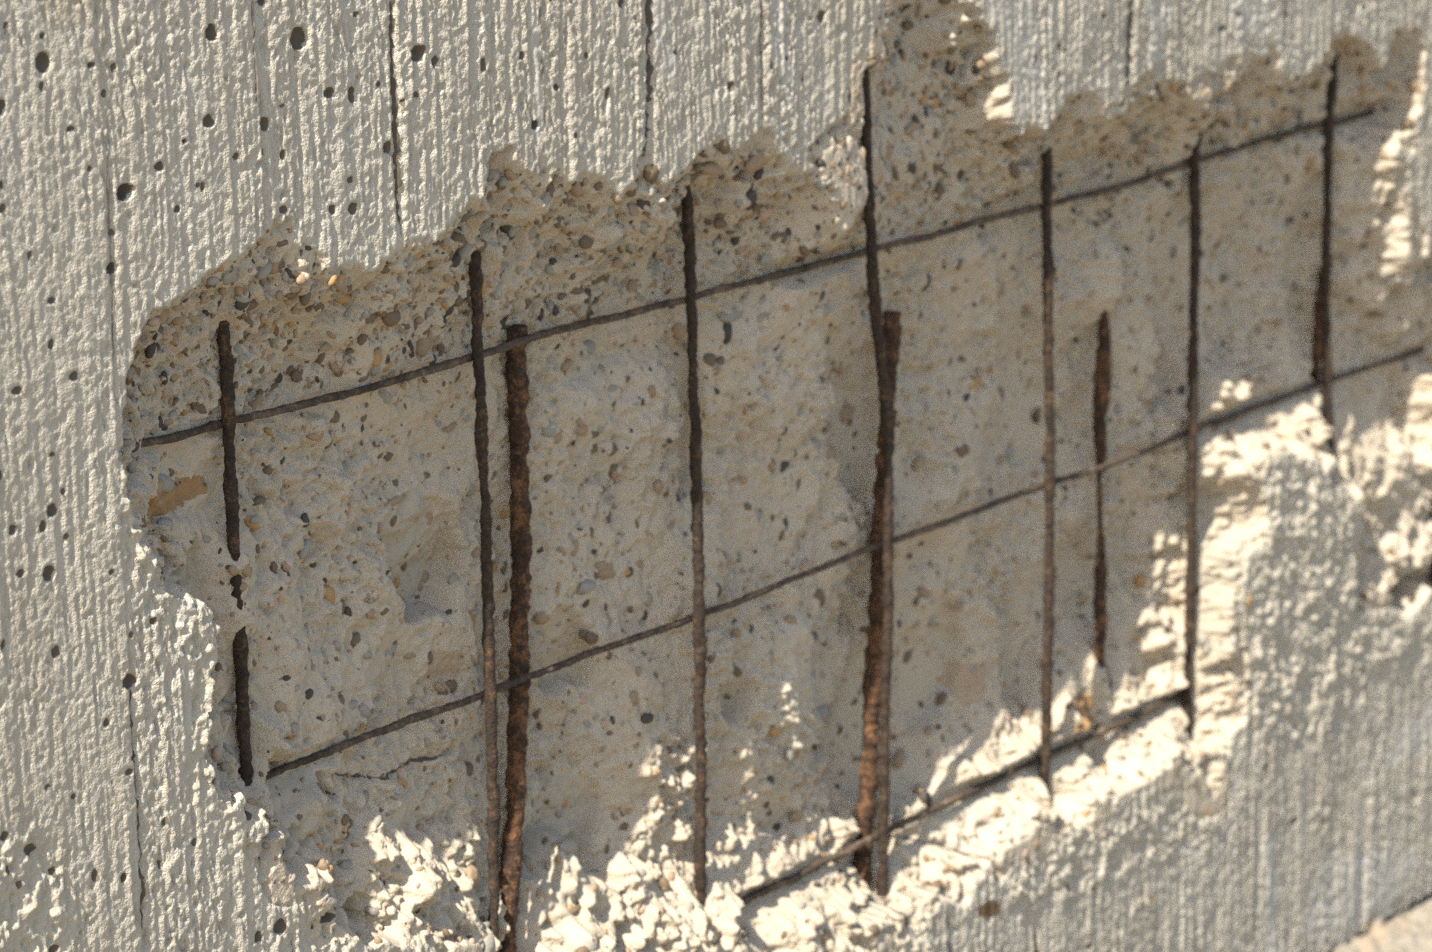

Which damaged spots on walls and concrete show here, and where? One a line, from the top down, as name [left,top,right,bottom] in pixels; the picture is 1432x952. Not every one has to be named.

spalling [633,385,656,432]
spalling [587,434,618,457]